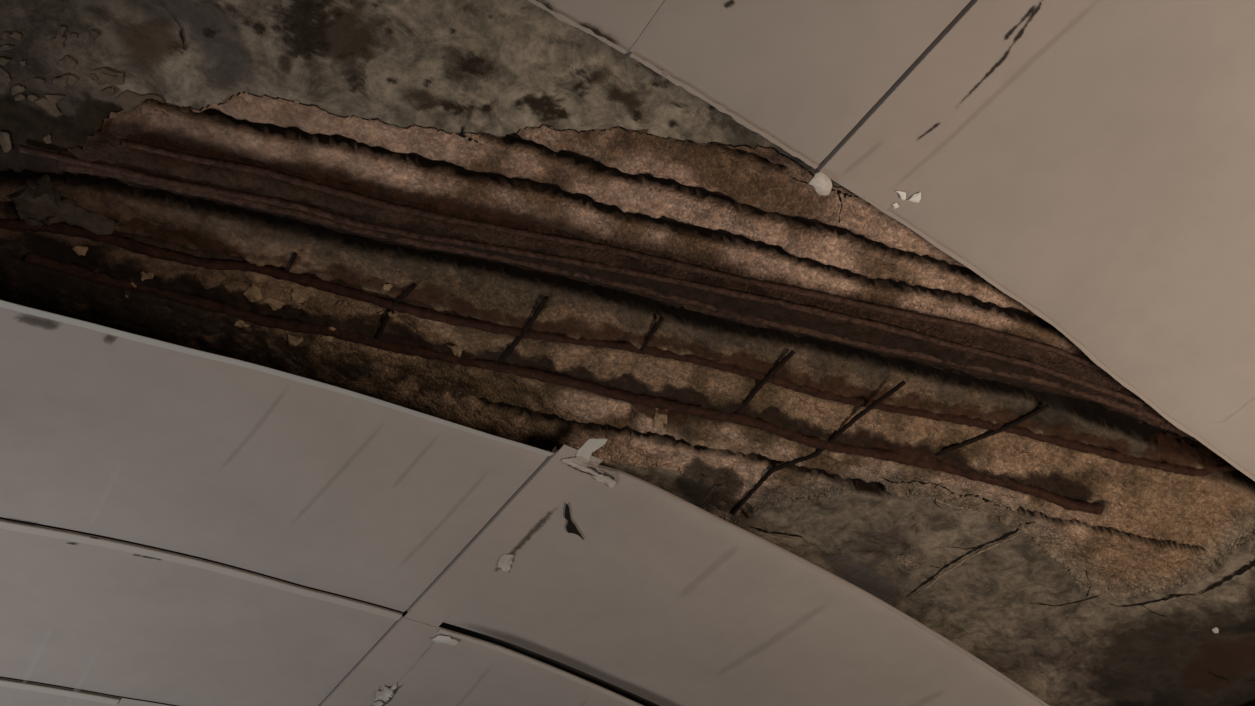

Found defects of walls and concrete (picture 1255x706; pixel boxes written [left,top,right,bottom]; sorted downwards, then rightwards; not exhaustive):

peeling [0,26,99,117]
damp [129,0,393,93]
damp [387,79,492,119]
damp [516,92,568,128]
damp [582,24,615,42]
damp [572,63,674,124]
spalling [0,67,1255,598]
rust [89,136,1226,502]
damp [824,555,897,601]
crack [1030,562,1255,617]
damp [1102,601,1255,706]